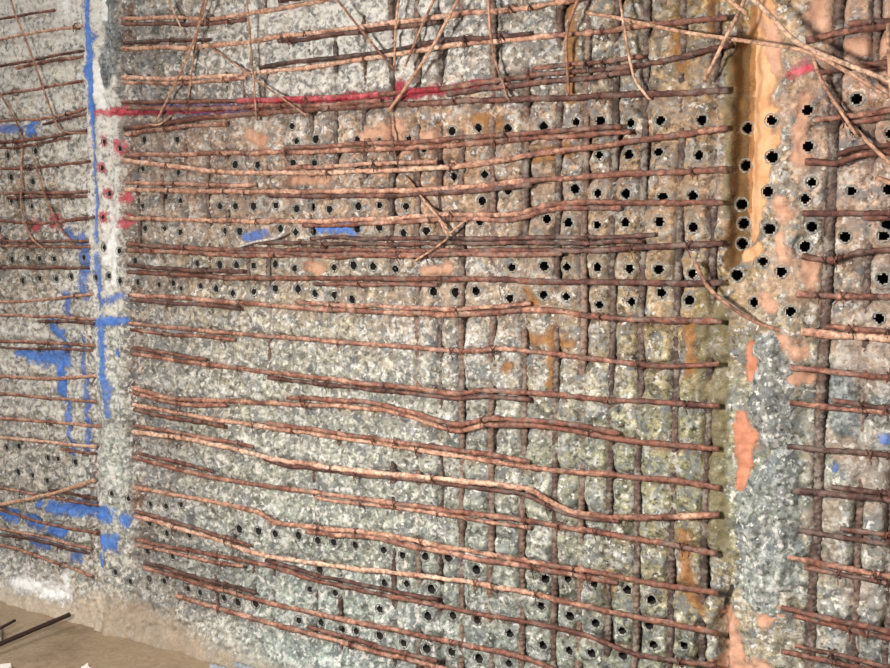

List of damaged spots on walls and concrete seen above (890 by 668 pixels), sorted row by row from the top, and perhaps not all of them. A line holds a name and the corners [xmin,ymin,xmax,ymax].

corrosion [707,0,723,35]
spalling [0,49,85,70]
spalling [1,79,84,100]
spalling [0,107,89,153]
corrosion [723,6,759,272]
spalling [0,160,91,175]
spalling [0,190,90,206]
spalling [0,215,95,249]
spalling [0,292,95,327]
spalling [0,339,96,357]
spalling [741,0,890,668]
spalling [0,508,98,578]